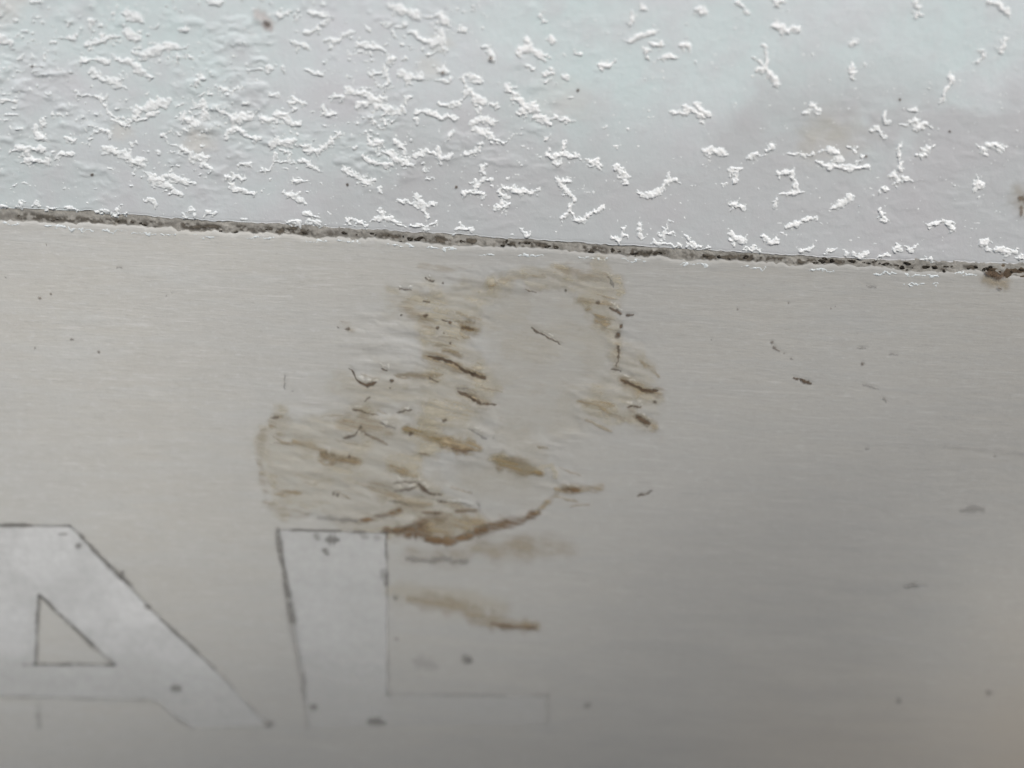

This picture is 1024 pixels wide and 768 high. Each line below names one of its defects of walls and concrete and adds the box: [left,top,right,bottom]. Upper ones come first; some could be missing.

crack [342,363,411,439]
damp [389,355,486,477]
crack [428,356,497,438]
crack [611,344,658,427]
crack [394,475,476,512]